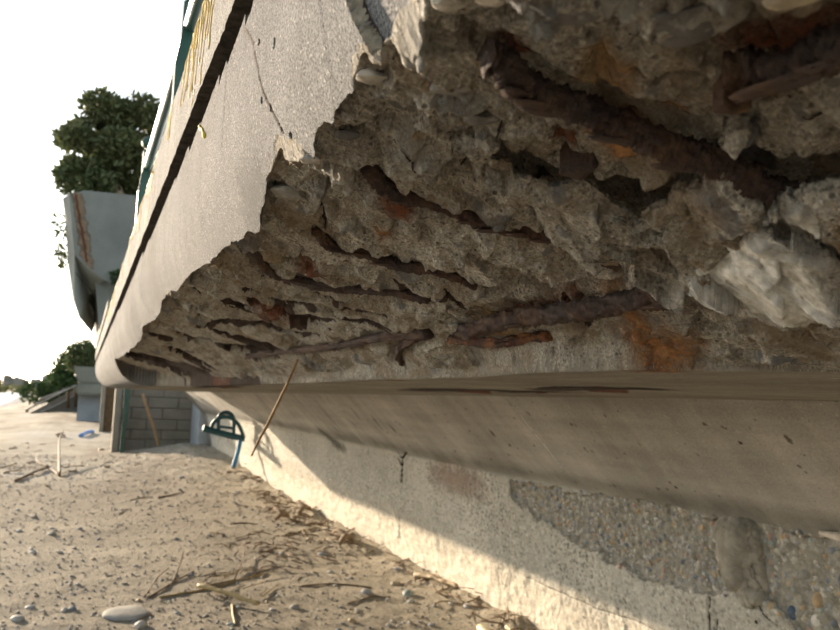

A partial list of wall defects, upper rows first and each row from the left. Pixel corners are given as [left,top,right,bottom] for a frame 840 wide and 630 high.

crack [244,24,283,134]
corrosion [72,193,94,270]
spalling [115,0,840,386]
corrosion [620,311,699,373]
corrosion [194,375,261,389]
corrosion [387,380,675,394]
crack [526,577,655,630]
peeling [510,479,736,597]
peeling [753,520,840,630]